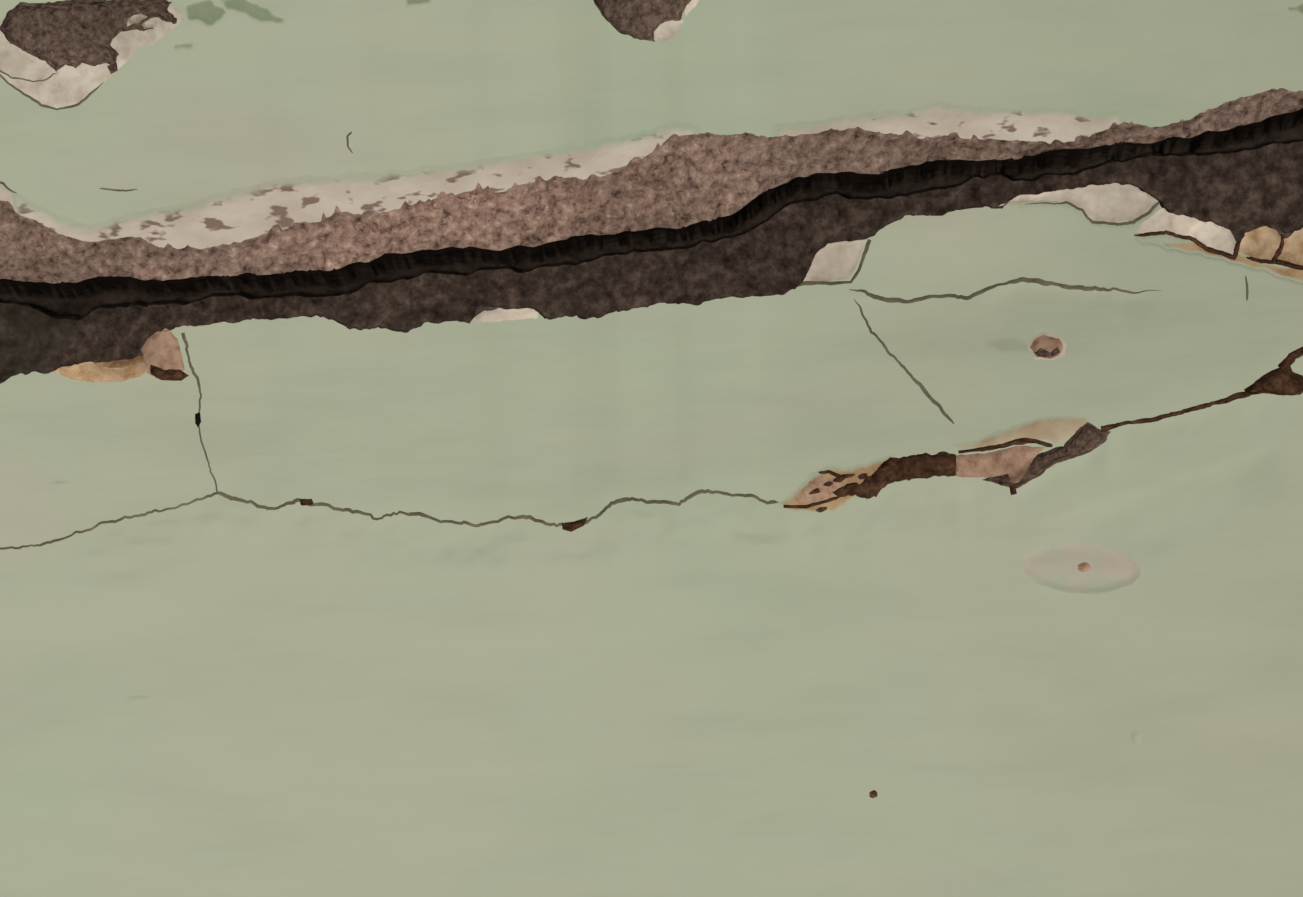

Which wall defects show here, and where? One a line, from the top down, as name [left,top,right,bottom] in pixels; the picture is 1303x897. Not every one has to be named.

spalling [0,0,184,110]
spalling [593,0,699,42]
peeling [771,102,1128,144]
peeling [0,121,700,249]
flaking render [804,240,867,282]
flaking render [999,183,1303,284]
crack [0,88,1303,550]
peeling [1027,332,1067,360]